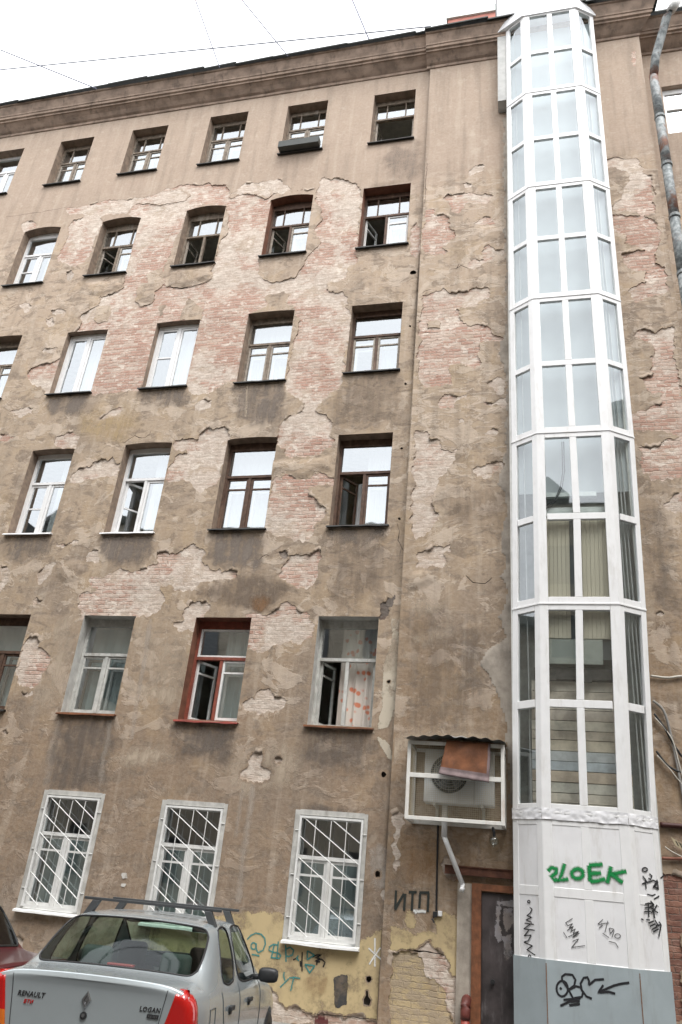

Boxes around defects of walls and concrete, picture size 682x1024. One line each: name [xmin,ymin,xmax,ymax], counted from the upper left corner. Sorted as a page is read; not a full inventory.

flaking render [409,162,495,275]
flaking render [607,157,669,302]
flaking render [54,175,363,458]
flaking render [404,286,504,423]
flaking render [165,425,232,495]
flaking render [264,472,334,589]
flaking render [15,633,51,697]
flaking render [77,543,239,632]
flaking render [242,688,288,715]
flaking render [246,601,315,654]
flaking render [240,747,283,784]
peeling [149,909,457,1024]